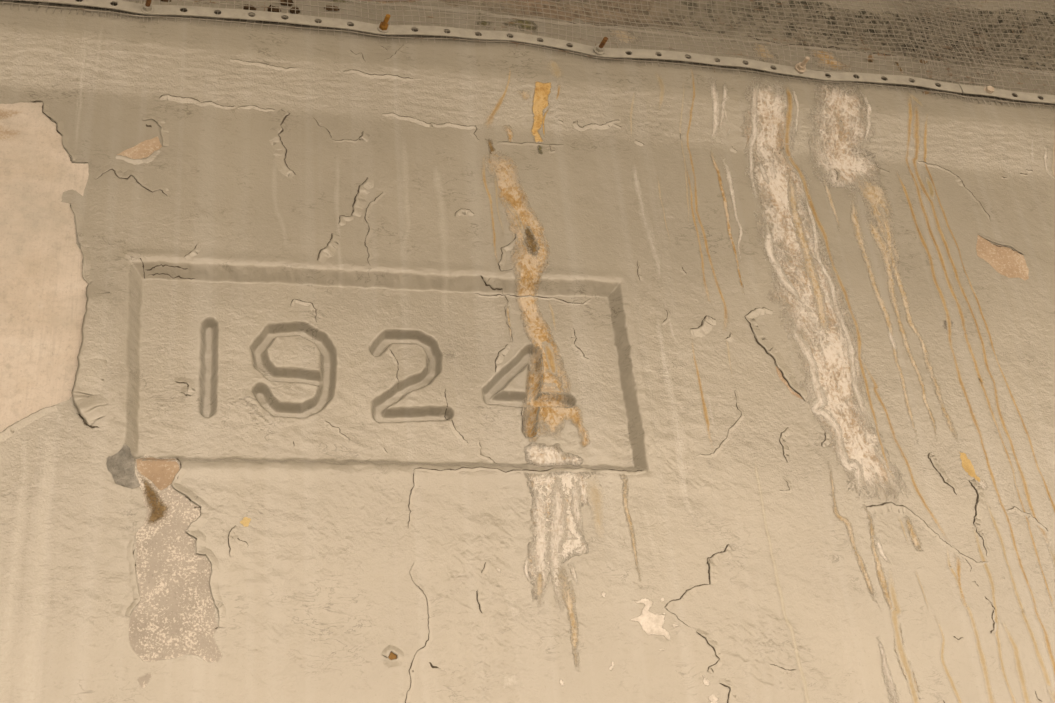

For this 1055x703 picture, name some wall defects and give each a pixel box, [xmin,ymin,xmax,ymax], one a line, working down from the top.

peeling [0,101,113,442]
crack [317,177,385,266]
corrosion [481,58,591,448]
damp [708,74,963,542]
peeling [976,233,1029,280]
peeling [106,444,227,688]
crack [405,562,433,703]
crack [408,388,646,529]
damp [523,442,606,672]
damp [615,473,663,588]
crack [663,544,737,703]
crack [866,453,1048,634]